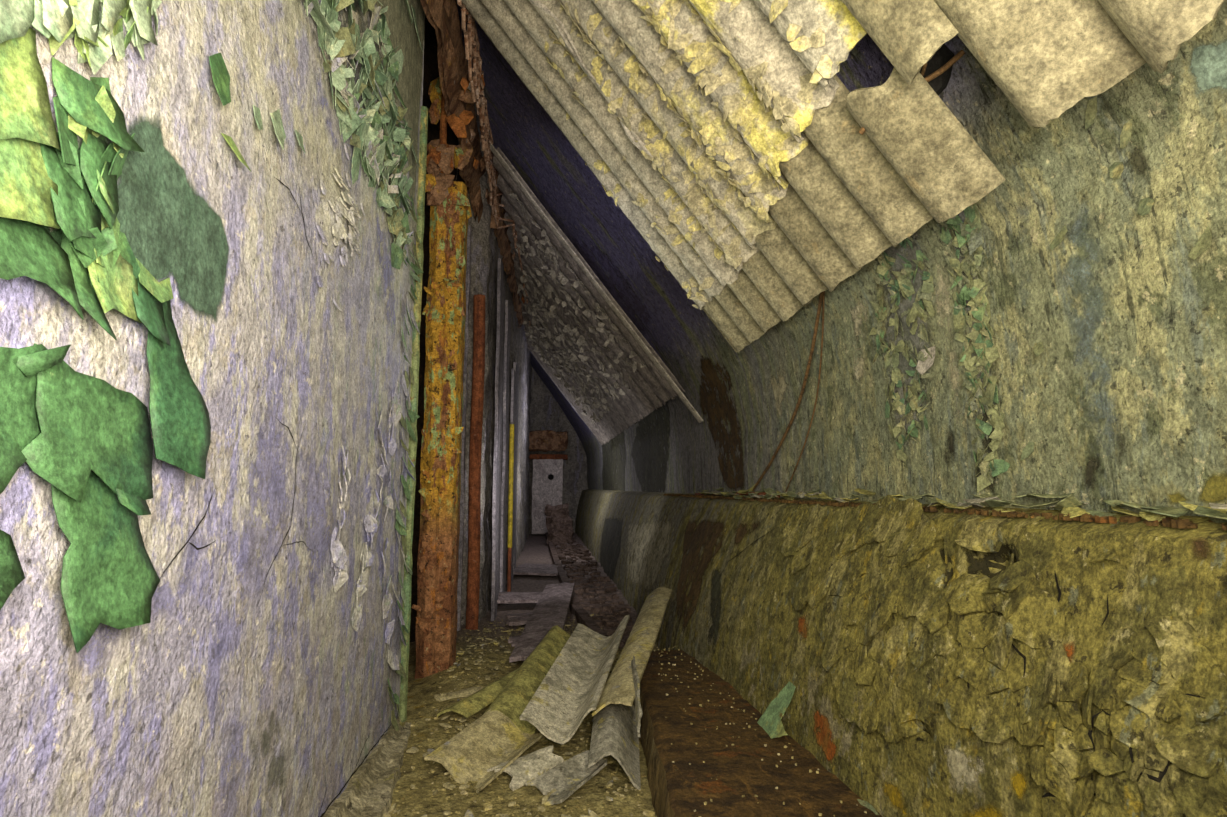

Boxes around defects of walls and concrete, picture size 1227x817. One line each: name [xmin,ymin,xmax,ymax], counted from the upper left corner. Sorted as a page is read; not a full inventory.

peeling [209,53,231,106]
rust [420,0,531,328]
peeling [529,0,833,271]
peeling [0,0,211,653]
peeling [681,276,714,309]
leakage [700,356,744,490]
peeling [699,203,1227,817]
crack [1054,572,1062,602]
leakage [1192,539,1209,558]
crack [982,644,1026,675]
crack [1088,710,1110,796]
crack [1129,747,1170,783]